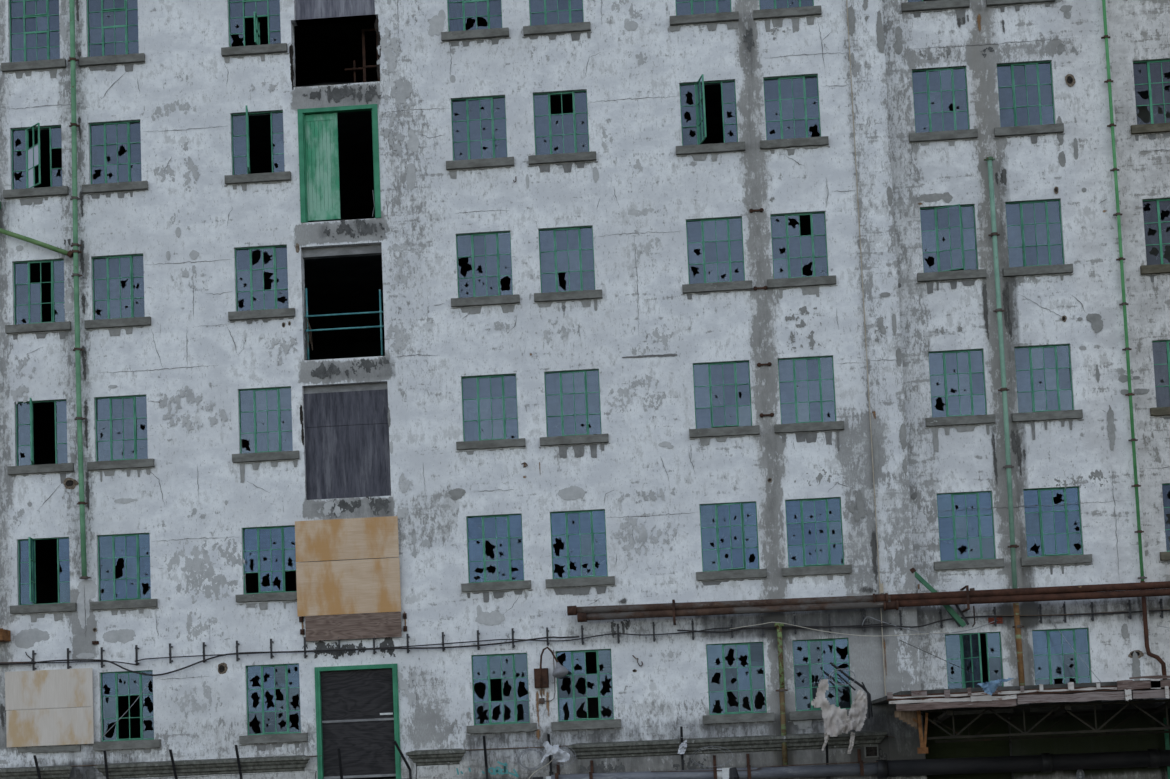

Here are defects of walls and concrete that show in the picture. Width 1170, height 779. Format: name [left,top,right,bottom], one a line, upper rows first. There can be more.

damp [743,28,755,52]
peeling [159,386,232,441]
peeling [10,537,268,649]